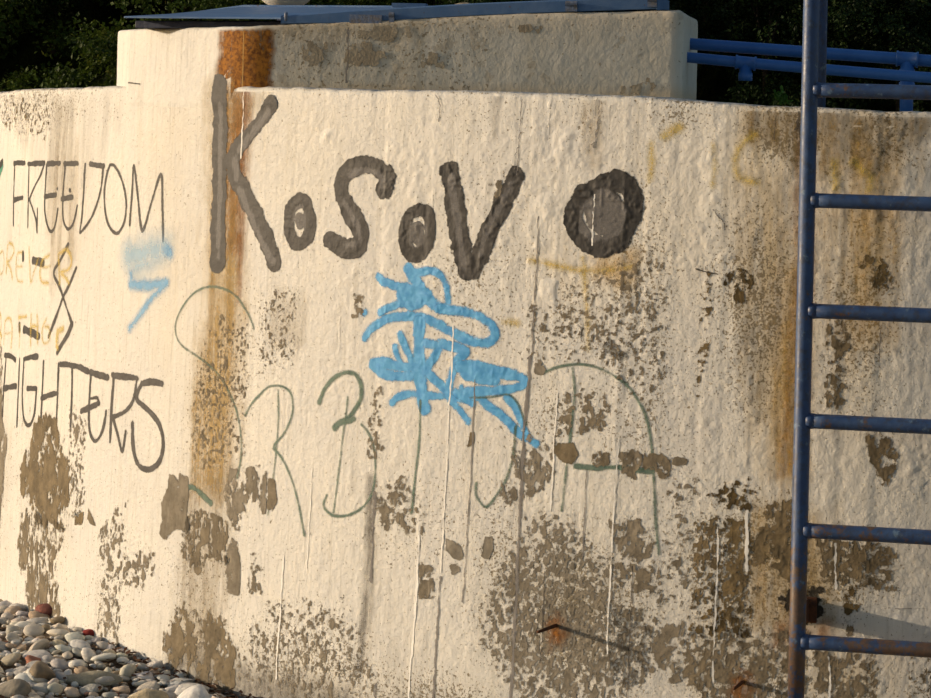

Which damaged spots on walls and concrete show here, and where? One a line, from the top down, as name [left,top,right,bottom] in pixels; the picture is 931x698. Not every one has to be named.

rust [217,29,274,154]
rust [192,169,239,499]
leakage [235,555,297,698]
leakage [606,436,619,654]